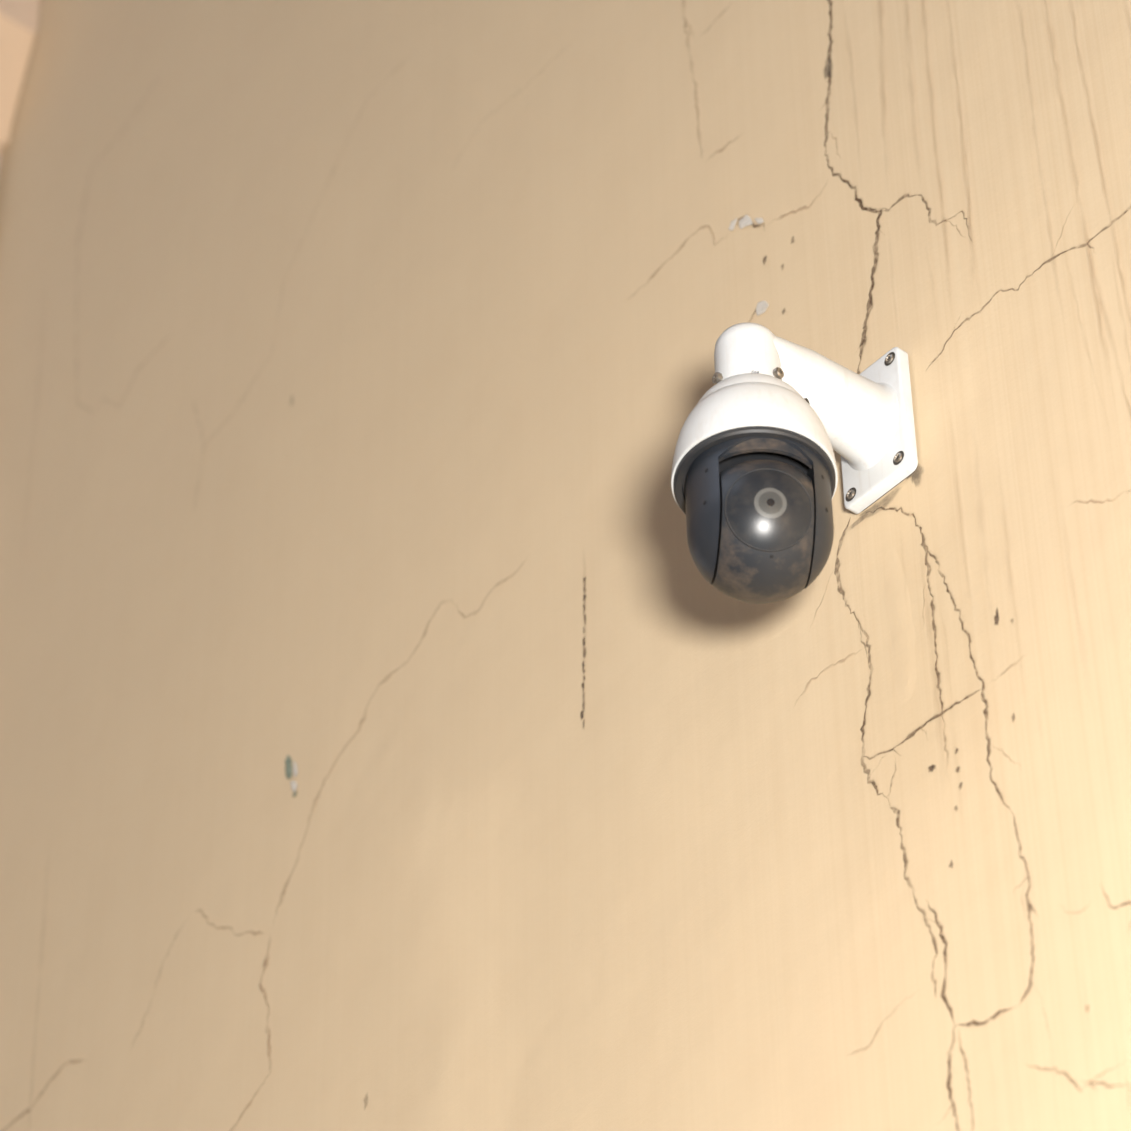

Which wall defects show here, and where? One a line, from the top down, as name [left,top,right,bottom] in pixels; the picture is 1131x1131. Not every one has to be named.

crack [824,0,930,373]
crack [835,507,1011,867]
peeling [285,756,298,796]
crack [928,857,1034,1030]
crack [947,1063,955,1112]